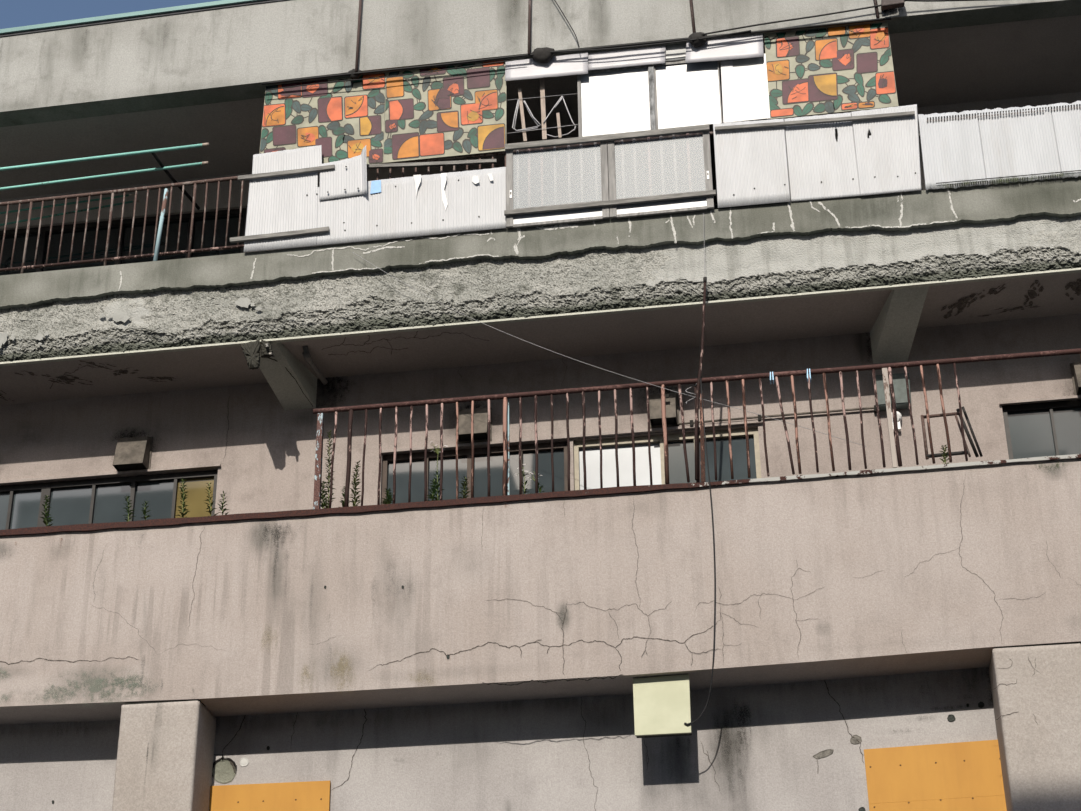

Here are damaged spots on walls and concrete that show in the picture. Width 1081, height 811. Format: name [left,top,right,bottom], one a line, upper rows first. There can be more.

peeling [0,332,16,348]
peeling [235,297,262,311]
crack [905,474,1079,690]
crack [0,656,138,665]
crack [369,502,824,811]
crack [332,709,367,790]
crack [824,680,864,763]